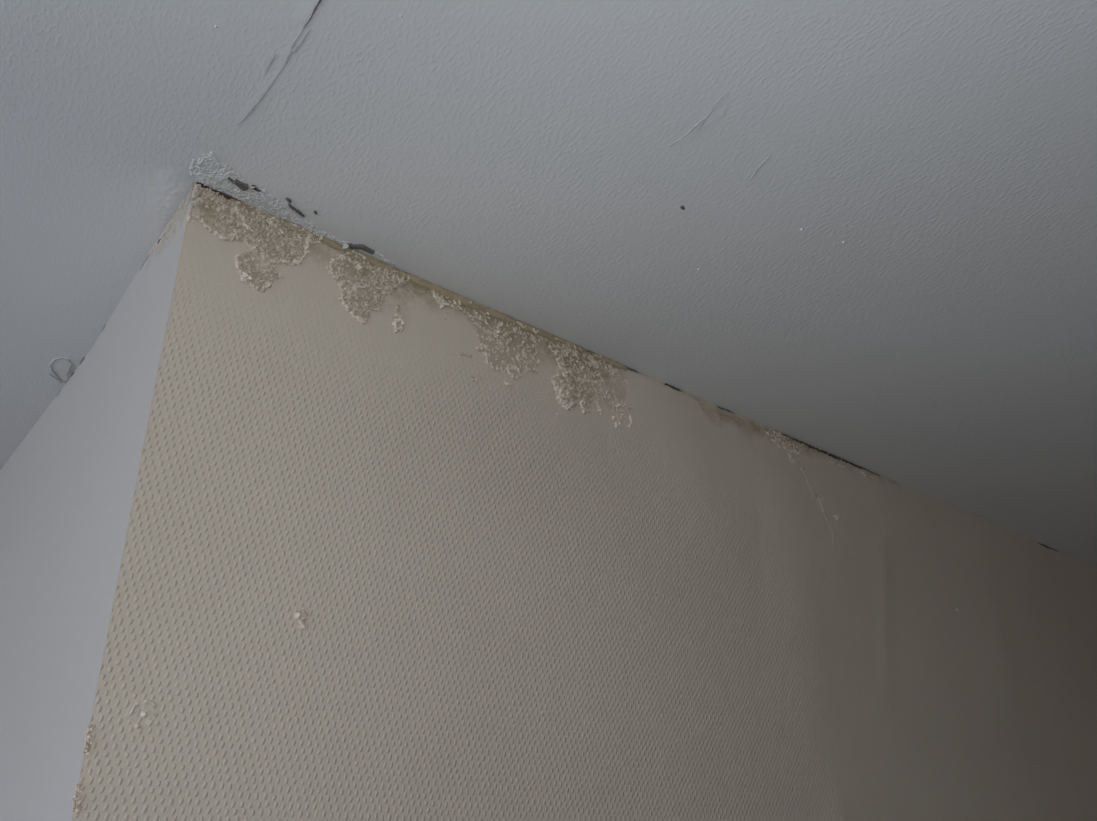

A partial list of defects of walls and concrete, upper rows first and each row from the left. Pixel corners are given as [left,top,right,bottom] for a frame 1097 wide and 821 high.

crack [234,0,322,125]
peeling [189,151,411,333]
peeling [429,290,633,429]